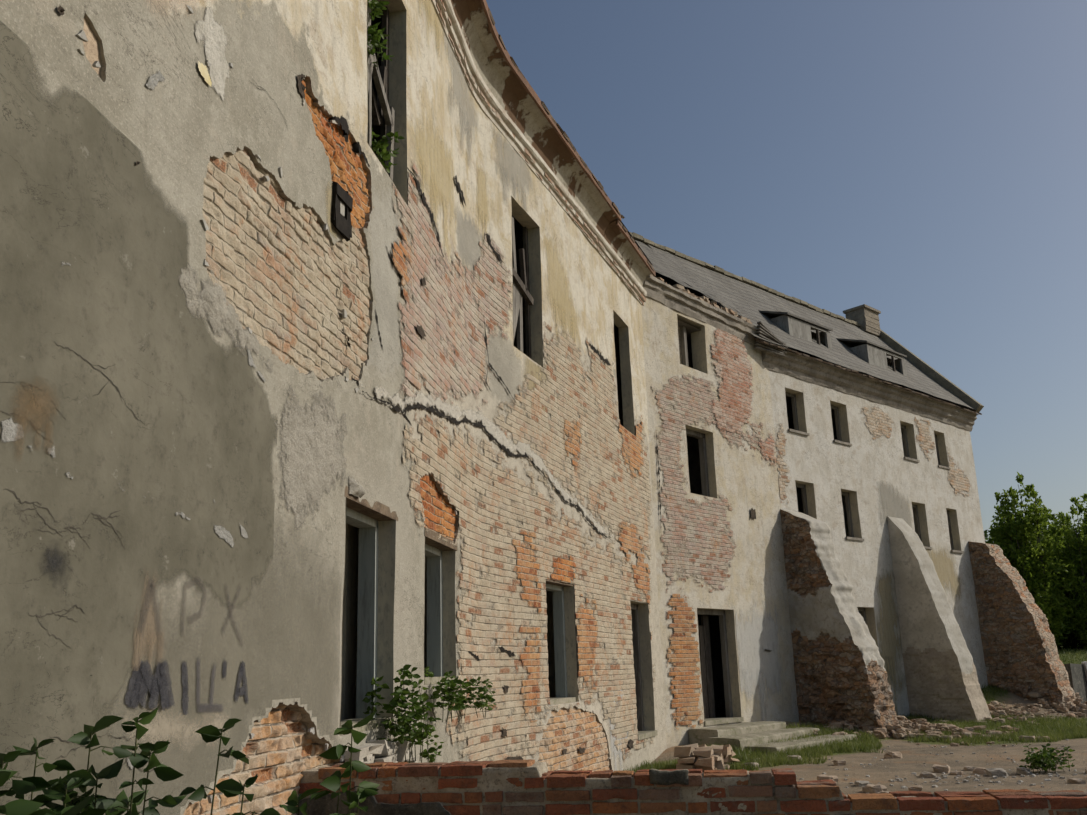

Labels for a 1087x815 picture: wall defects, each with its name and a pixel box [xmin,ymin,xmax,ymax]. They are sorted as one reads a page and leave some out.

spalling [76,17,101,77]
peeling [185,4,233,101]
spalling [200,79,373,393]
crack [54,341,144,424]
water stain [0,21,336,815]
crack [351,376,611,540]
spalling [393,160,790,772]
crack [4,489,126,550]
crack [28,605,84,647]